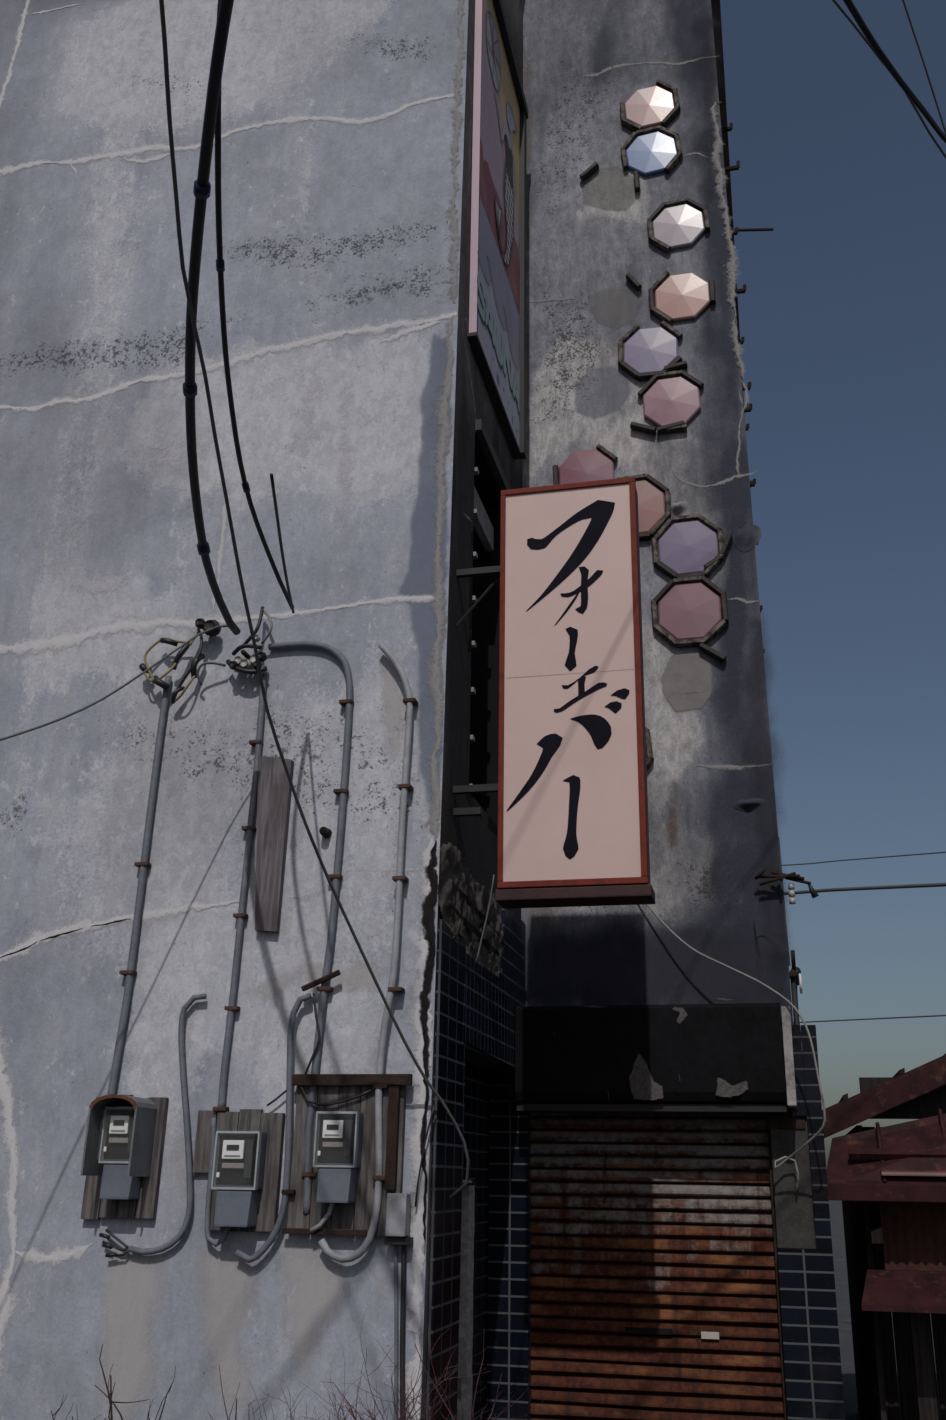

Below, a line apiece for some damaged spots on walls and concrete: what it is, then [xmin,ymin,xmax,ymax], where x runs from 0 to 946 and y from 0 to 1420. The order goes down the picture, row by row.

crack [0,0,82,107]
crack [0,93,464,177]
crack [0,311,476,419]
crack [0,484,443,656]
peeling [405,0,504,1420]
leakage [527,623,786,1004]
crack [0,900,239,962]
peeling [672,1006,688,1024]
peeling [629,1053,663,1100]
peeling [716,1077,748,1098]
crack [0,996,93,1377]